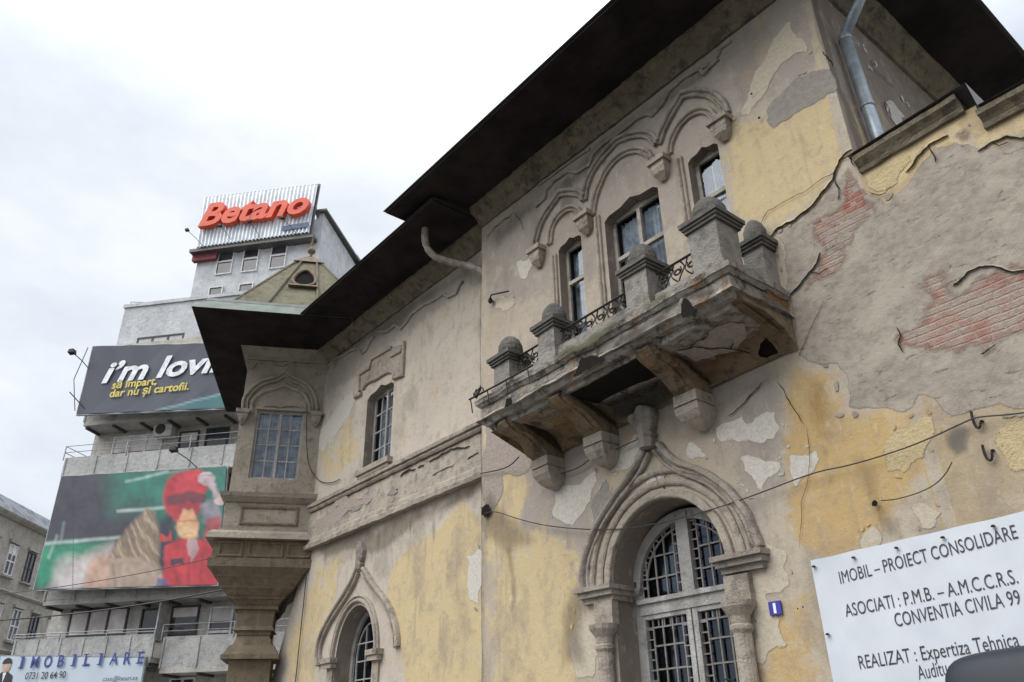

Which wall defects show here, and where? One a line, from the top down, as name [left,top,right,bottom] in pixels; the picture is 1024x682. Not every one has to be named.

peeling [732,22,837,129]
crack [761,148,853,236]
crack [870,134,948,196]
crack [977,134,1024,151]
crack [743,252,827,301]
spalling [776,123,1024,478]
crack [953,264,1024,285]
peeling [551,434,639,525]
peeling [686,411,784,459]
crack [729,381,810,547]
peeling [737,445,819,498]
peeling [467,545,482,611]